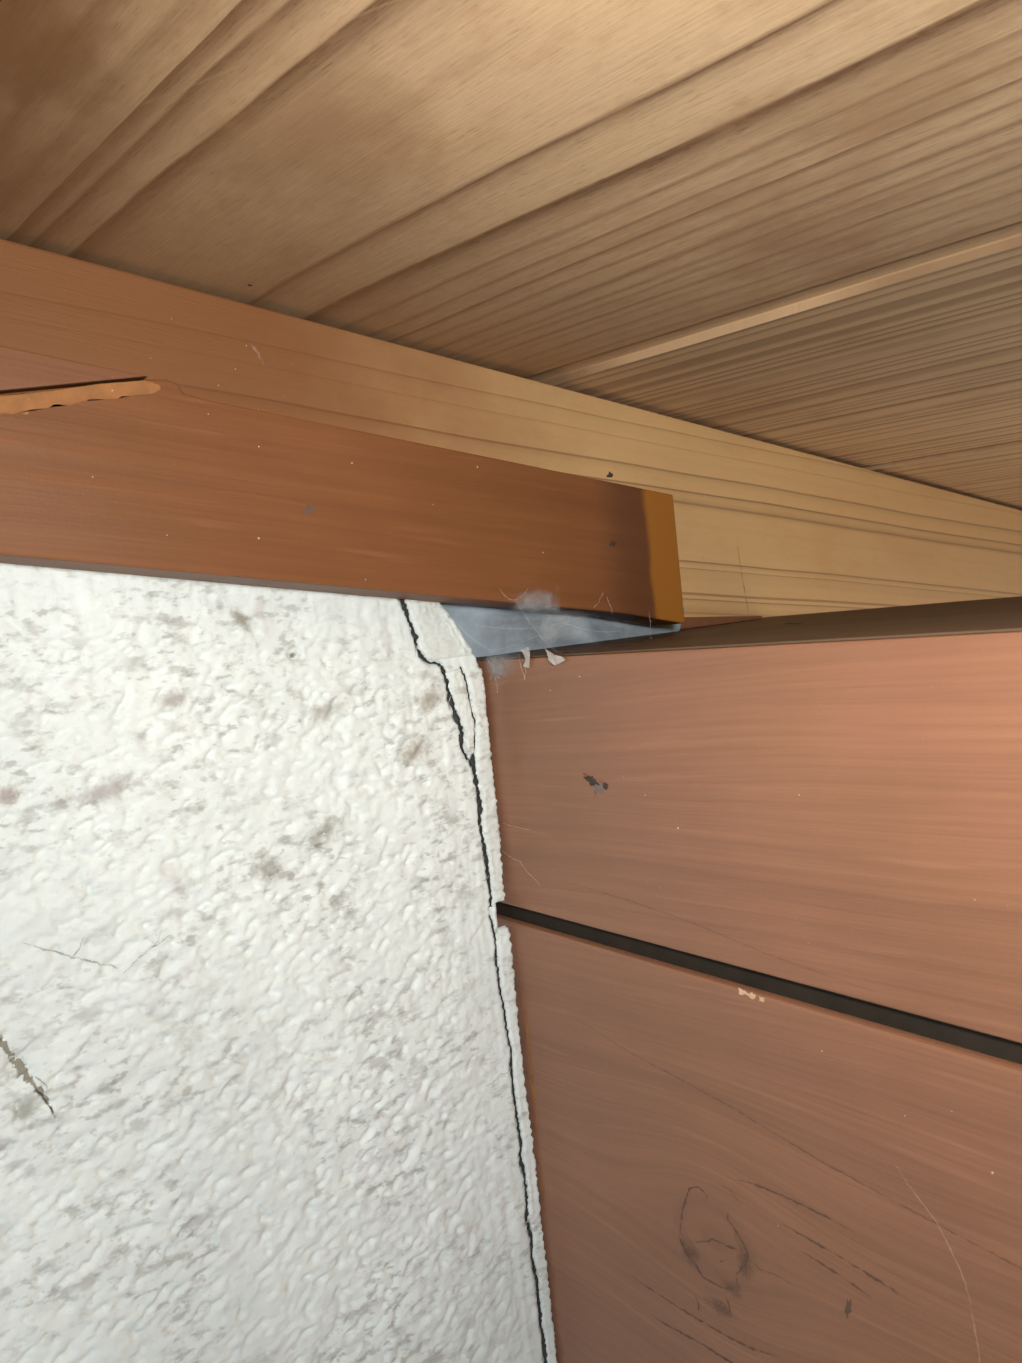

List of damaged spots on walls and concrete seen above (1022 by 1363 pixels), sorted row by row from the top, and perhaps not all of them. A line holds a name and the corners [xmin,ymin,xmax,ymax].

crack [0,1034,56,1119]
crack [400,599,547,1363]